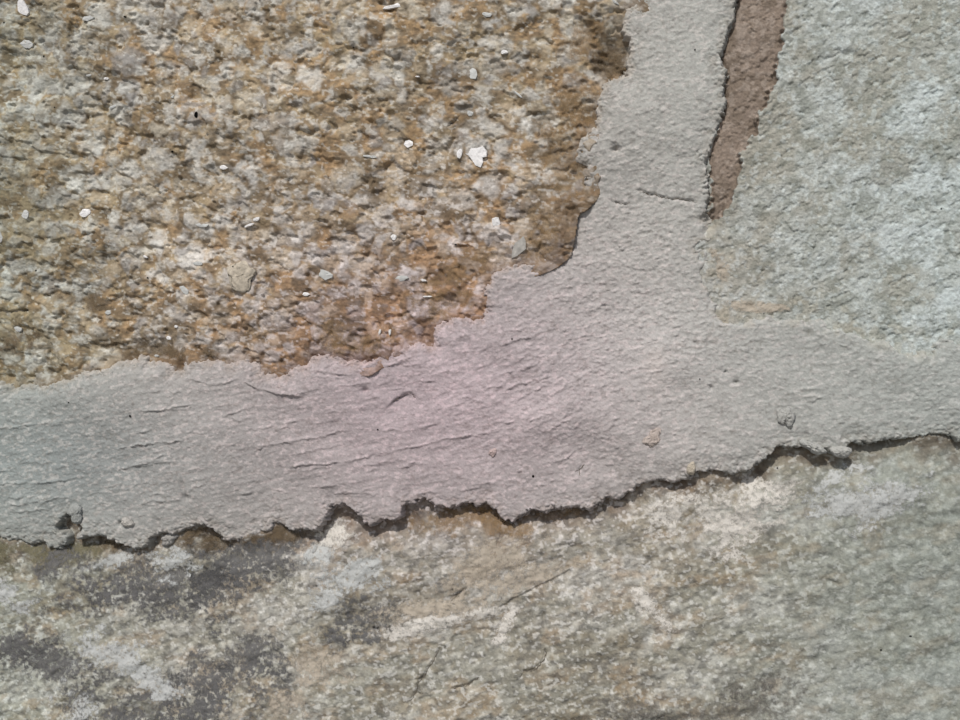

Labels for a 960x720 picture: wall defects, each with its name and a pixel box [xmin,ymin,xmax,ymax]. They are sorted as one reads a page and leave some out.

peeling [17,0,30,16]
peeling [707,0,787,221]
peeling [457,146,488,168]